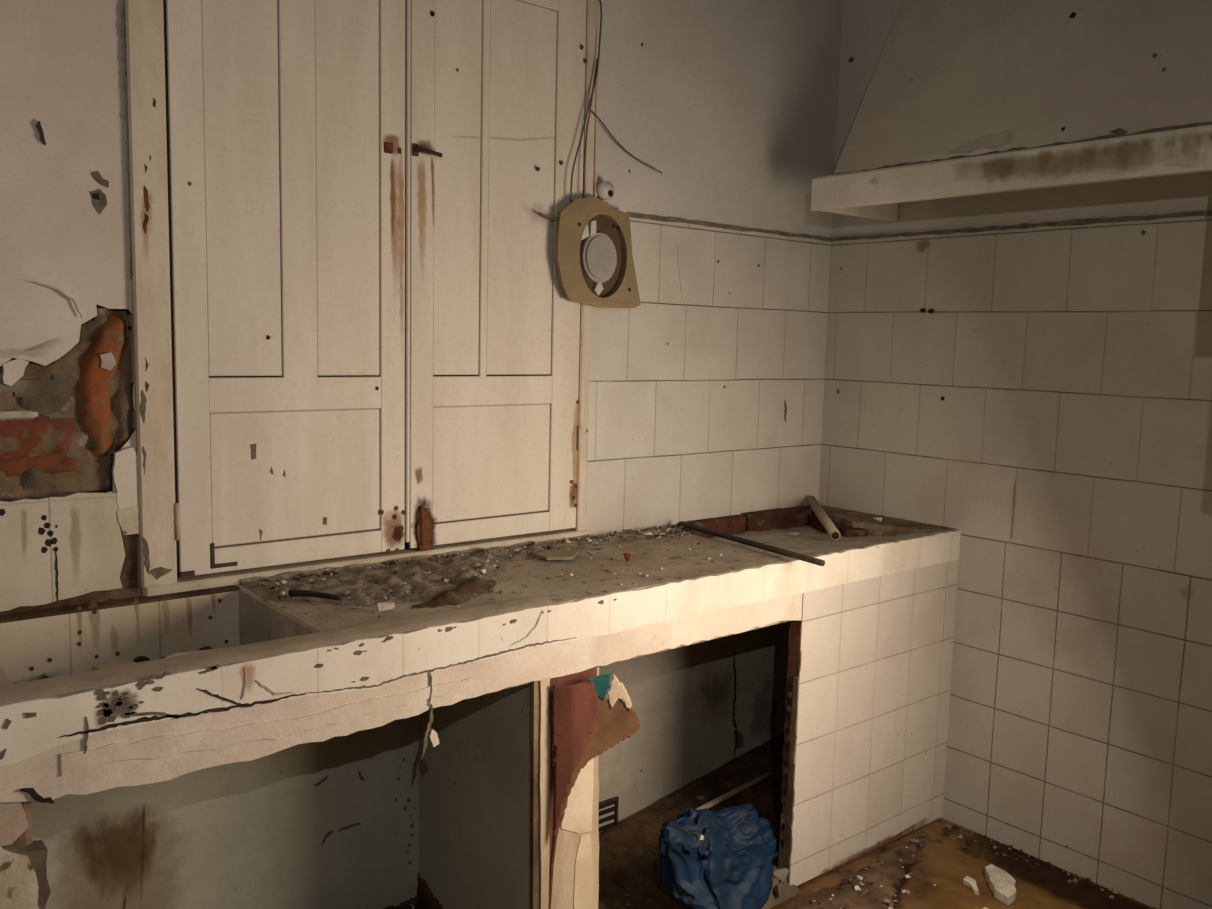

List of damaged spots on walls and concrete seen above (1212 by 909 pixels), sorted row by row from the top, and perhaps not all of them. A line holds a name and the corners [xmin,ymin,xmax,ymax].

peeling [143,155,151,234]
corrosion [386,136,398,229]
corrosion [420,143,435,209]
spalling [0,308,173,588]
corrosion [380,500,436,554]
peeling [3,712,37,729]
crack [60,610,577,754]
water stain [83,810,154,909]